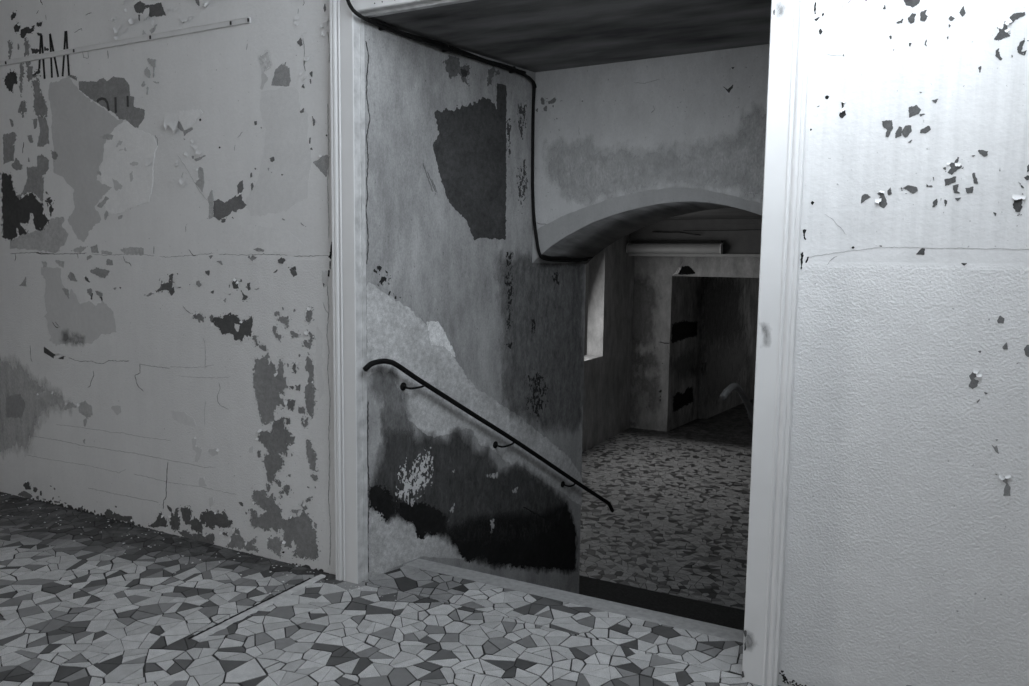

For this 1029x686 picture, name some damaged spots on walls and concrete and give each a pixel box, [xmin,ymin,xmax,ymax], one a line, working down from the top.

peeling [443,53,470,87]
peeling [896,0,928,24]
peeling [994,12,1029,60]
flaking render [0,10,144,346]
peeling [192,155,283,223]
peeling [433,66,507,240]
damp [549,111,766,199]
peeling [882,105,931,143]
peeling [861,157,978,208]
peeling [1012,165,1029,216]
peeling [144,255,321,561]
damp [367,368,578,571]